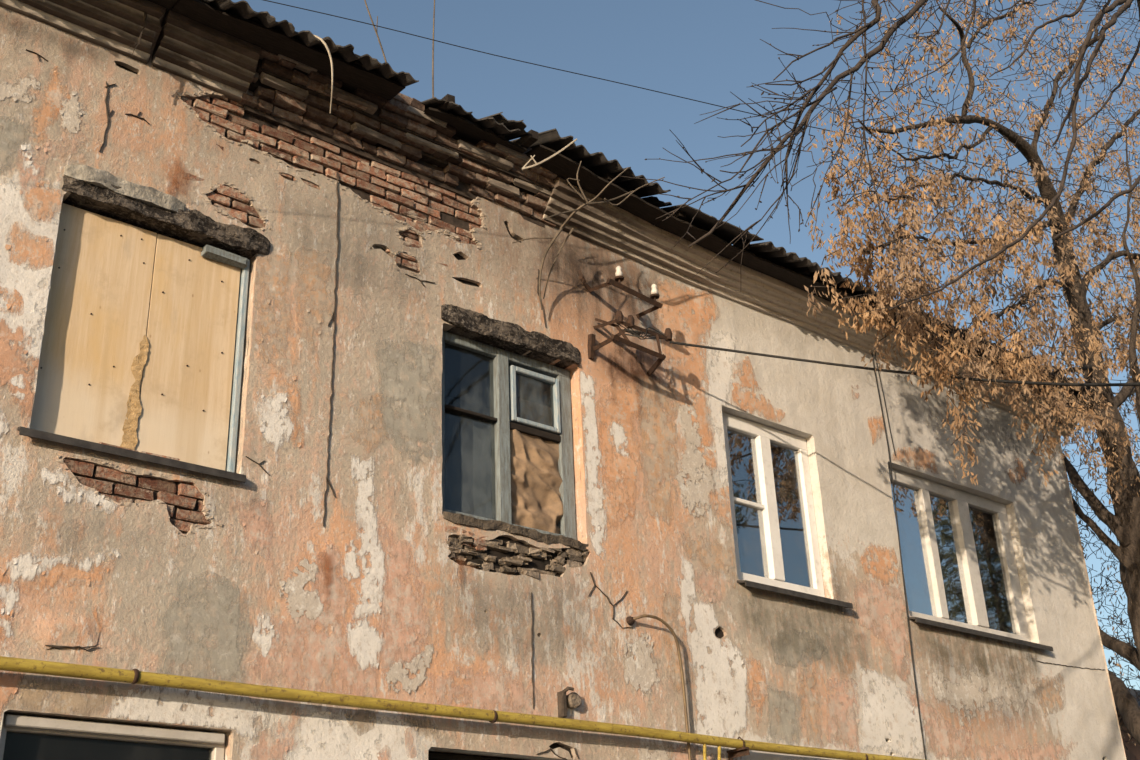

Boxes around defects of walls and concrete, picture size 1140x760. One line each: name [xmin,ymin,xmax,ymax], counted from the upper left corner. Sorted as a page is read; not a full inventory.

peeling [0,66,87,434]
crack [323,171,339,526]
spalling [176,90,487,277]
peeling [444,280,785,579]
peeling [0,453,547,760]
crack [589,572,631,628]
peeling [622,556,768,760]